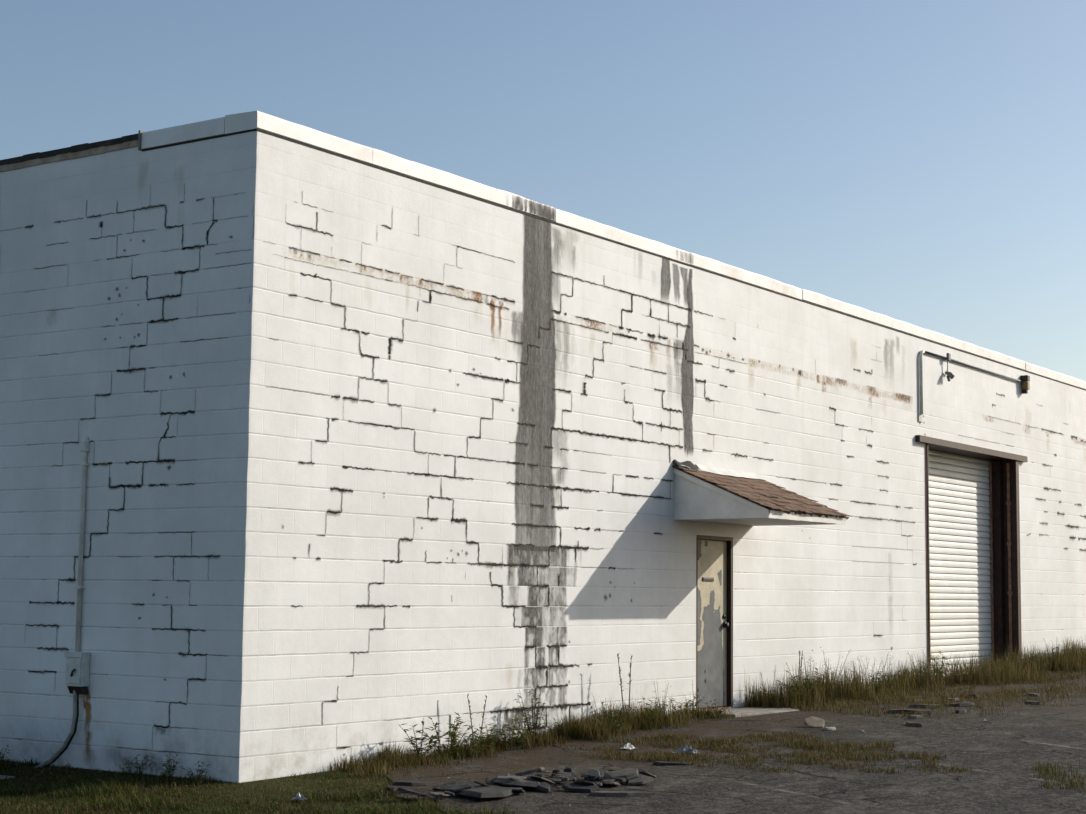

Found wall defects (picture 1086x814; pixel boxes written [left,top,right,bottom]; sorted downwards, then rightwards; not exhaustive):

crack [25,190,232,673]
rust [474,292,503,329]
water stain [505,195,567,737]
crack [281,192,915,731]
water stain [661,258,694,453]
crack [1029,488,1086,551]
crack [120,531,224,752]
peeling [697,570,725,708]